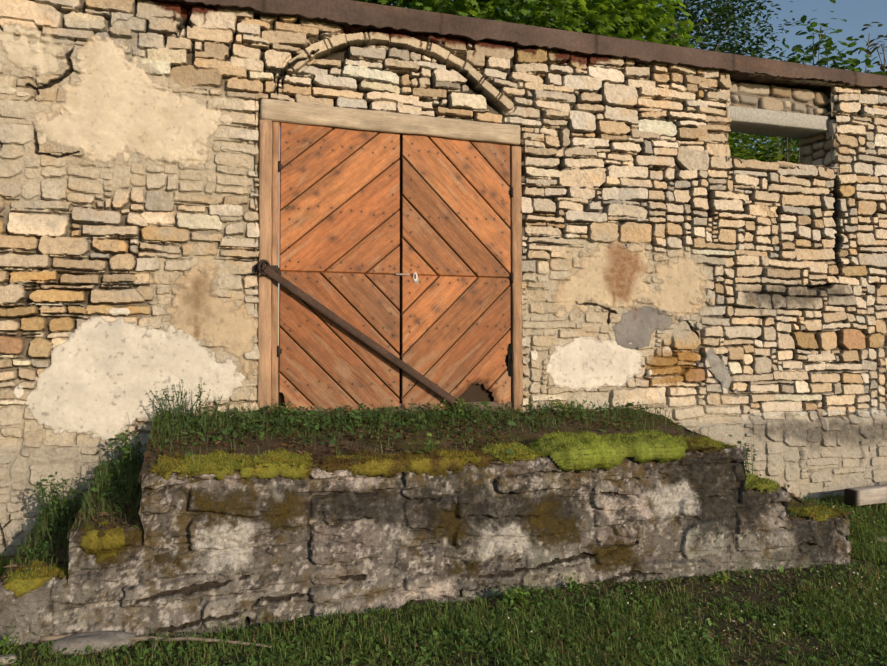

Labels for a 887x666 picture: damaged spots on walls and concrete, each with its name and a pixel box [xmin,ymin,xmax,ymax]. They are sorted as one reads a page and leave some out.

crack [26,39,76,95]
crack [34,130,79,158]